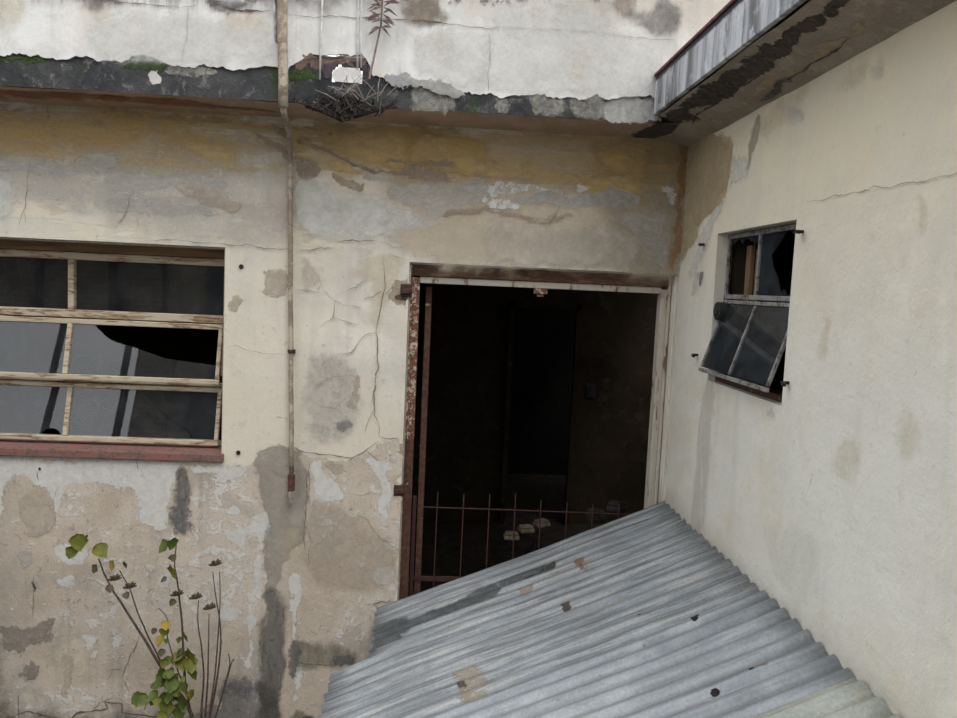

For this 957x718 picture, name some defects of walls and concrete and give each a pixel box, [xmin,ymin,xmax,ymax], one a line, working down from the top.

crack [106,0,195,59]
crack [223,5,270,13]
crack [296,2,669,90]
damp [747,115,759,168]
peeling [443,206,572,224]
crack [807,172,957,202]
crack [116,167,410,565]
peeling [0,437,404,718]
crack [11,634,176,718]
damp [186,589,354,718]